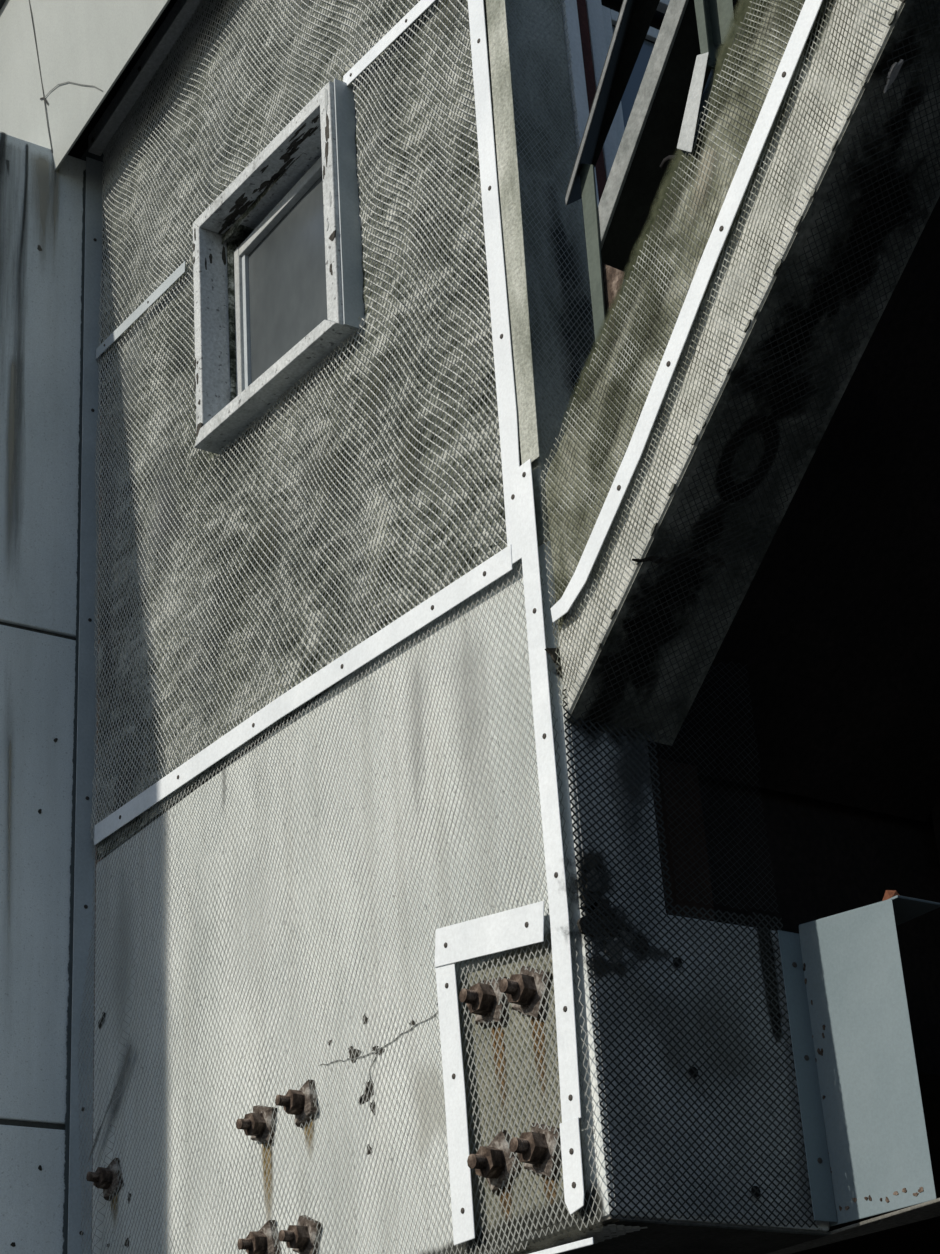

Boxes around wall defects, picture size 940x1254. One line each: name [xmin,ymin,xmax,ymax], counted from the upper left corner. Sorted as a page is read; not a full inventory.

water stain [870,28,919,77]
water stain [0,132,9,172]
peeling [193,89,336,270]
water stain [18,145,59,344]
peeling [194,358,203,437]
water stain [582,83,927,730]
crack [320,1012,437,1080]
corrosion [492,1025,505,1098]
corrosion [531,1018,544,1087]
corrosion [262,1143,271,1211]
corrosion [500,1184,511,1220]
corrosion [543,1177,555,1204]